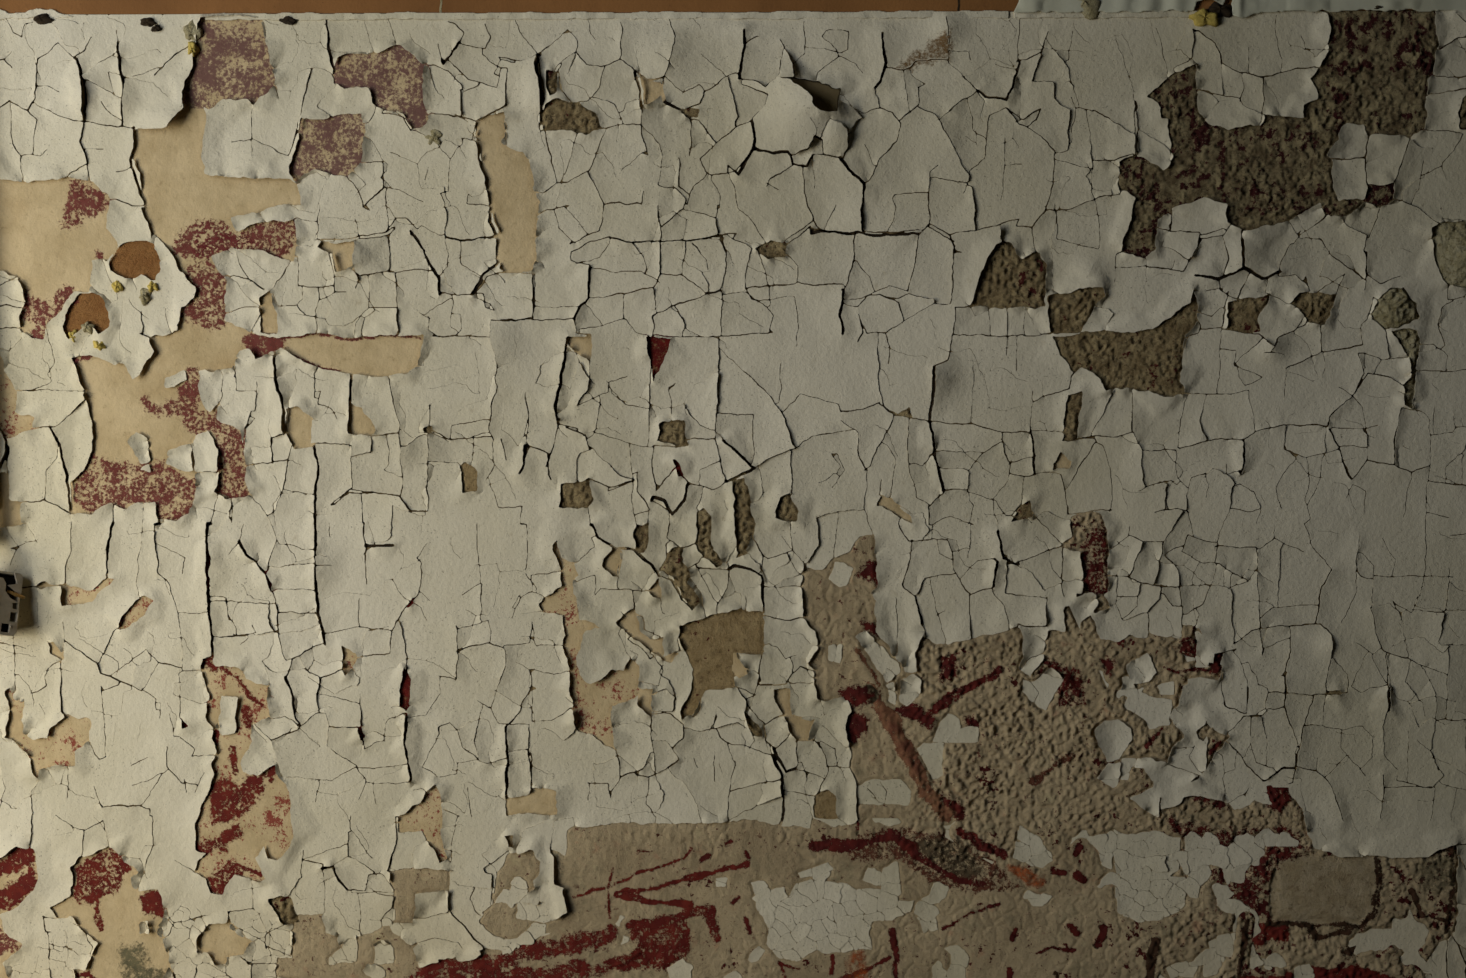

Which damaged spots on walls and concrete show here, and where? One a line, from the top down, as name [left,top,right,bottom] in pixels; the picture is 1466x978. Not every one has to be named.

crack [0,20,178,206]
peeling [1038,11,1331,170]
crack [0,282,72,576]
crack [136,0,1466,862]
spalling [965,241,1047,313]
spalling [1047,287,1201,397]
spalling [1116,10,1466,485]
crack [106,522,114,574]
peeling [210,596,236,637]
crack [56,630,204,863]
peeling [0,663,293,978]
crack [296,816,397,928]